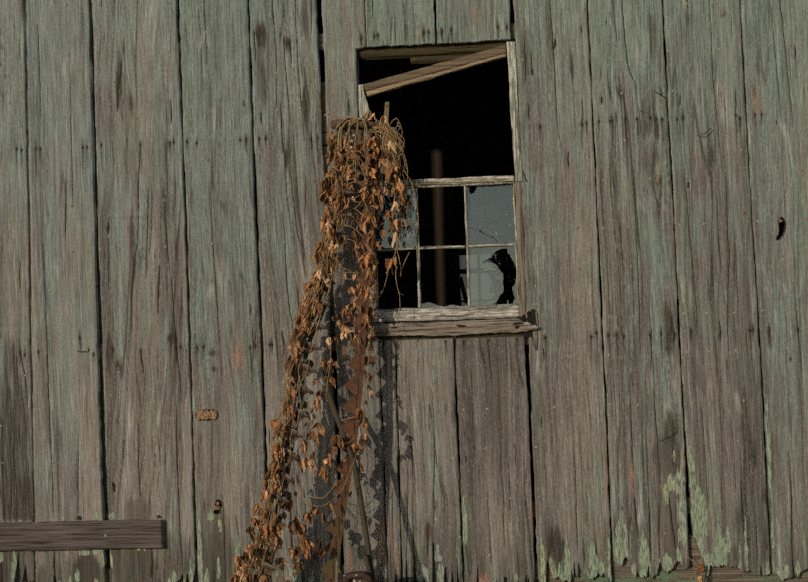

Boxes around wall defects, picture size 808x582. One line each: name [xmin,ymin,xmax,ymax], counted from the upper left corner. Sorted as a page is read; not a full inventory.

crack [606,0,681,152]
crack [628,177,652,361]
peeling [207,509,222,532]
crack [622,391,679,561]
peeling [663,473,676,505]
peeling [688,444,727,567]
peeling [93,549,113,568]
peeling [167,558,195,582]
peeling [540,535,572,582]
peeling [638,529,682,578]
peeling [766,520,775,575]